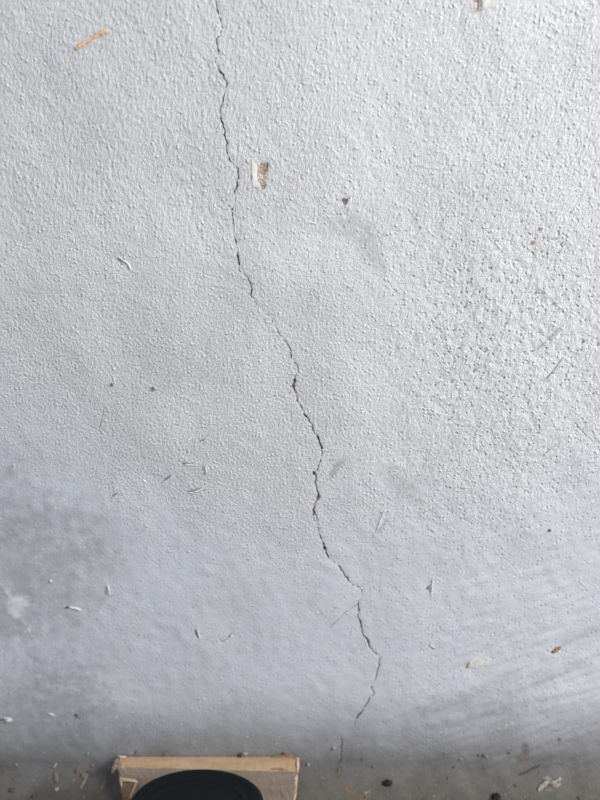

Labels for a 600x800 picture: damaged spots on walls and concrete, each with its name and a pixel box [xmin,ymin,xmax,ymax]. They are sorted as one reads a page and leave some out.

crack [215,2,380,719]